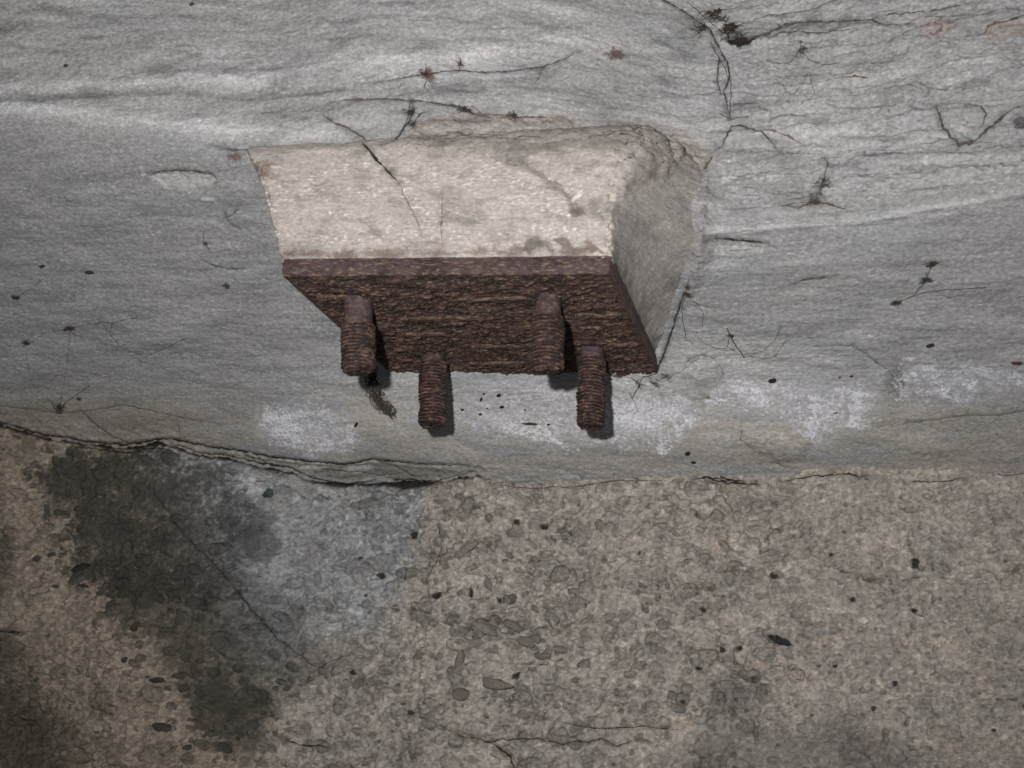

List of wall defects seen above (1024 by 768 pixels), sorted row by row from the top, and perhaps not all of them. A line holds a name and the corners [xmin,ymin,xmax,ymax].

crack [746,0,972,42]
crack [662,0,843,209]
crack [324,49,585,242]
crack [714,237,766,245]
rust [399,315,482,337]
crack [658,289,685,370]
leakage [254,402,360,456]
crack [0,405,761,489]
leakage [454,374,878,457]
crack [787,472,873,481]
crack [905,476,959,484]
leakage [24,446,277,762]